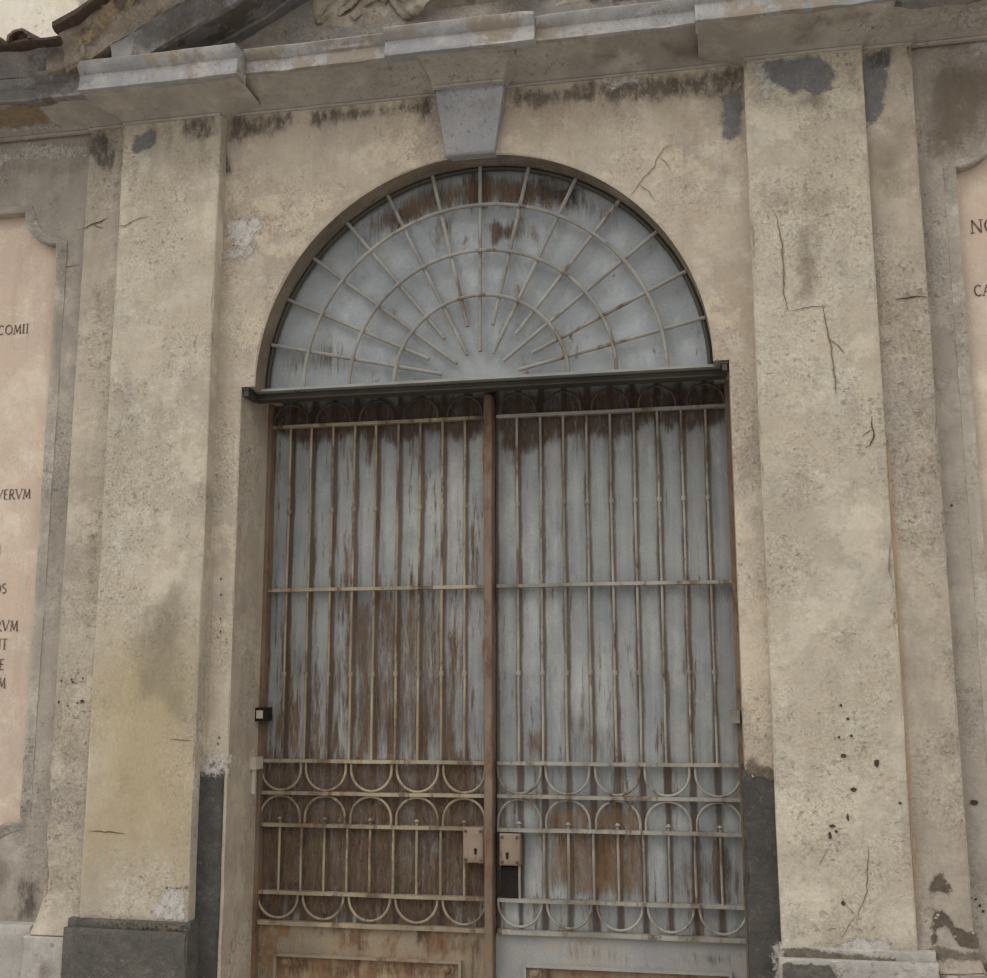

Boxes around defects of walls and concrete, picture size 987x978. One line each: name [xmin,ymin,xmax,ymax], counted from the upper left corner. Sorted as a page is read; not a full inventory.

water stain [514,59,778,108]
water stain [312,109,382,125]
water stain [88,133,114,168]
crack [631,144,672,200]
crack [775,214,845,392]
spalling [110,886,190,932]